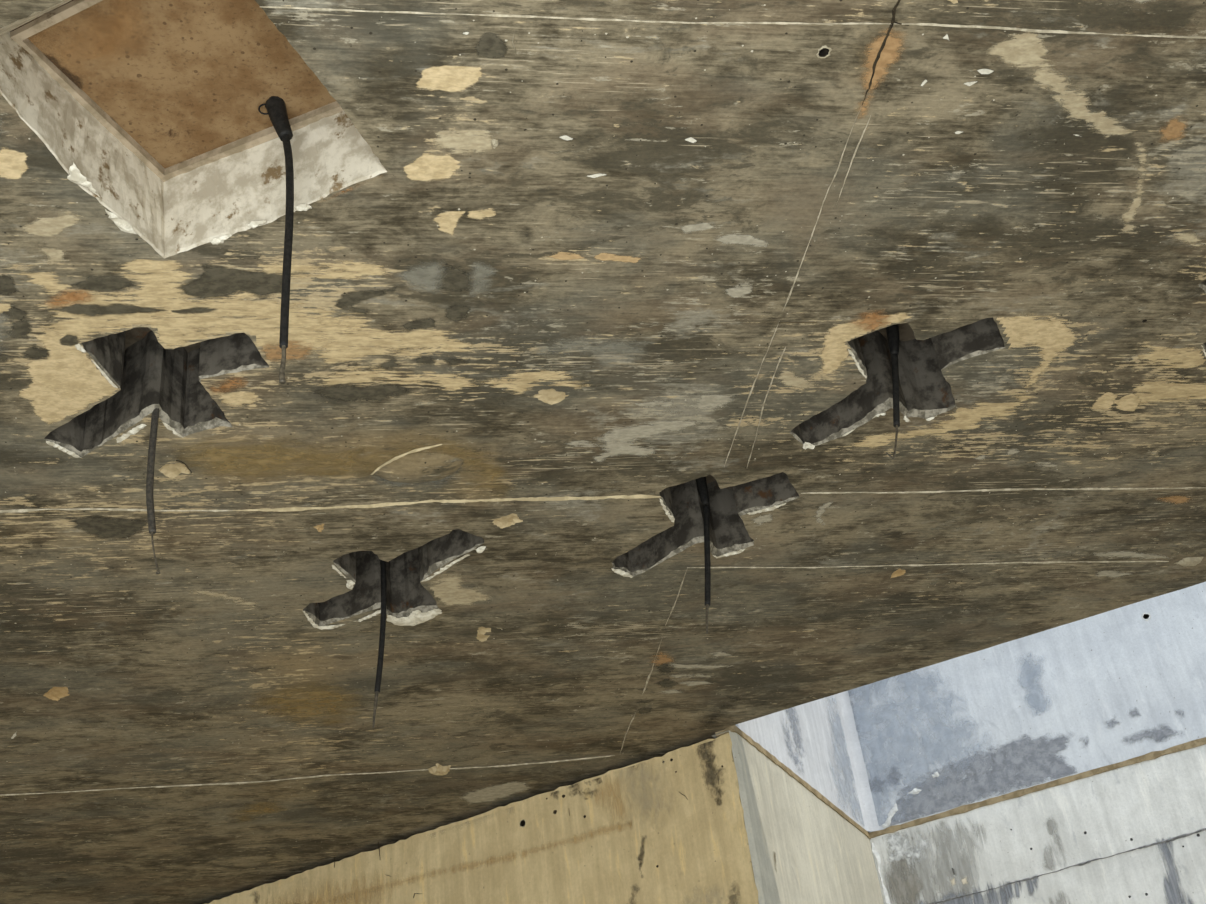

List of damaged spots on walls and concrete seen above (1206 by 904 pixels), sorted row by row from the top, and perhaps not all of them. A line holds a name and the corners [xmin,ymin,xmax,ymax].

rust [860,31,902,116]
flaking render [67,162,99,196]
crack [778,0,909,324]
peeling [987,32,1147,234]
rust [1160,119,1186,140]
peeling [13,208,592,424]
peeling [776,312,912,388]
peeling [843,315,1078,451]
flaking render [46,441,81,458]
peeling [303,546,490,630]
leakage [1021,661,1047,713]
leakage [832,672,1076,904]